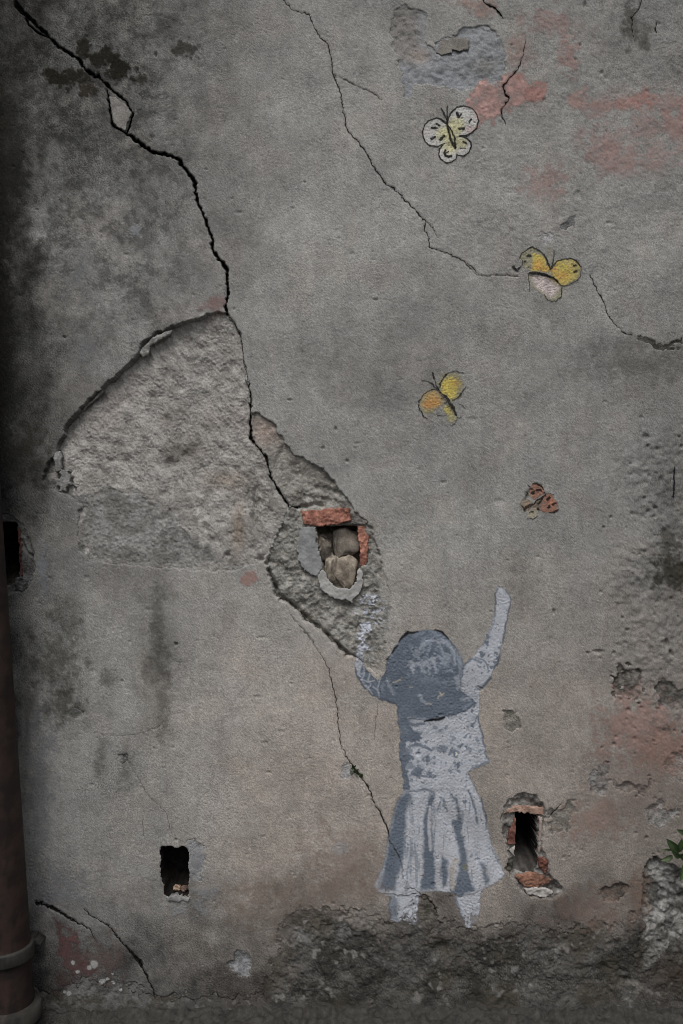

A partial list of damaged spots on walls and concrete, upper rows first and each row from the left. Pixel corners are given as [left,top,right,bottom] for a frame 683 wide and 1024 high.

crack [283,0,518,277]
peeling [389,5,506,98]
crack [500,42,526,124]
crack [14,0,298,508]
spalling [45,313,393,674]
crack [290,614,437,912]
crack [35,900,155,997]
spalling [160,846,190,902]
spalling [34,856,683,1014]
spalling [501,792,577,898]